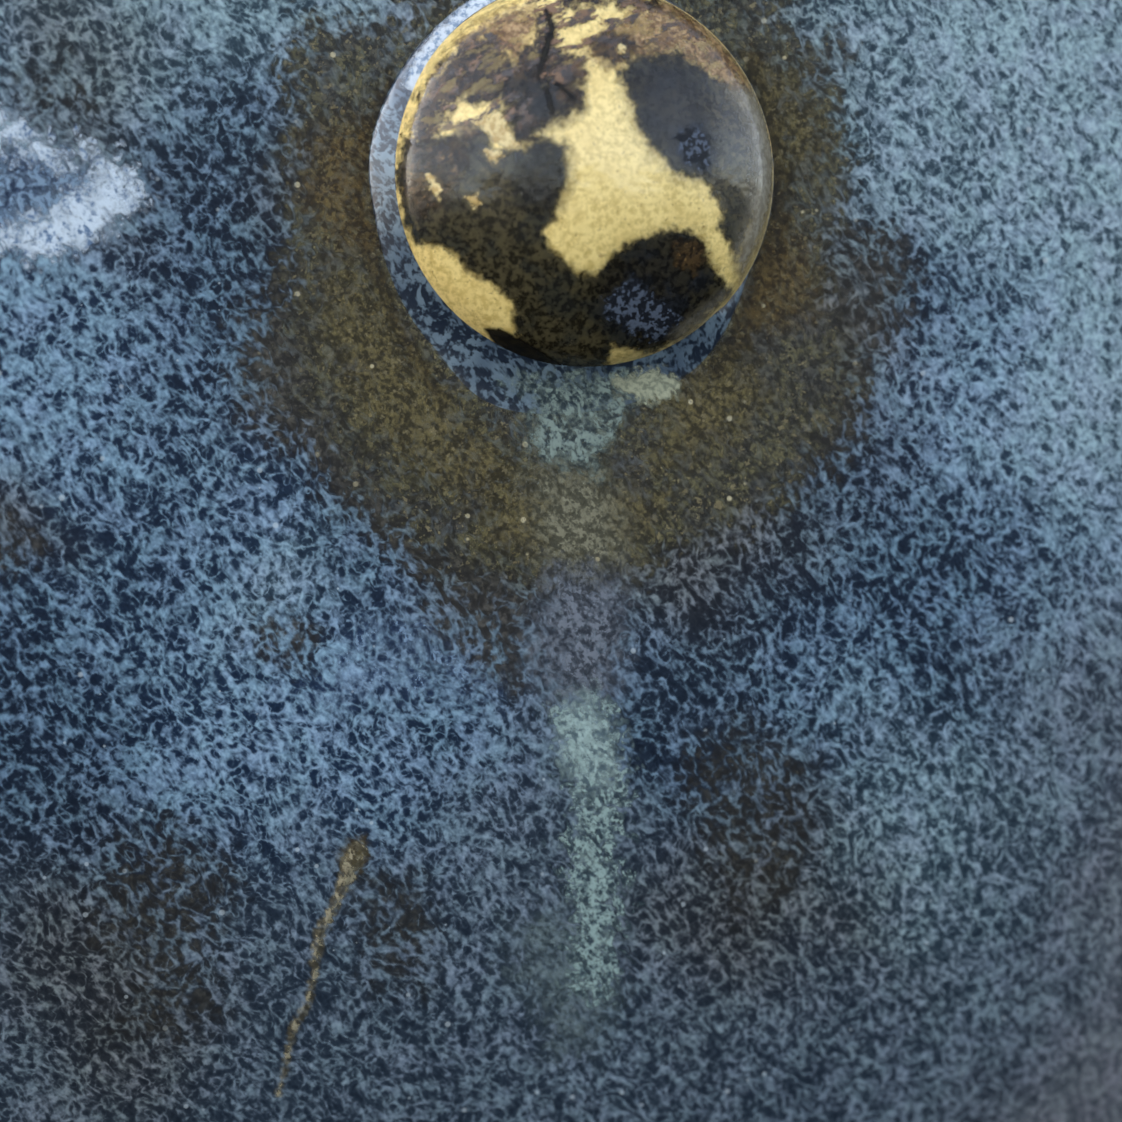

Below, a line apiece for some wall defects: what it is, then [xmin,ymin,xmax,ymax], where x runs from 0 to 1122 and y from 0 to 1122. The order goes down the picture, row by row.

damp [0,102,144,209]
corrosion [237,0,909,695]
damp [517,366,681,1035]